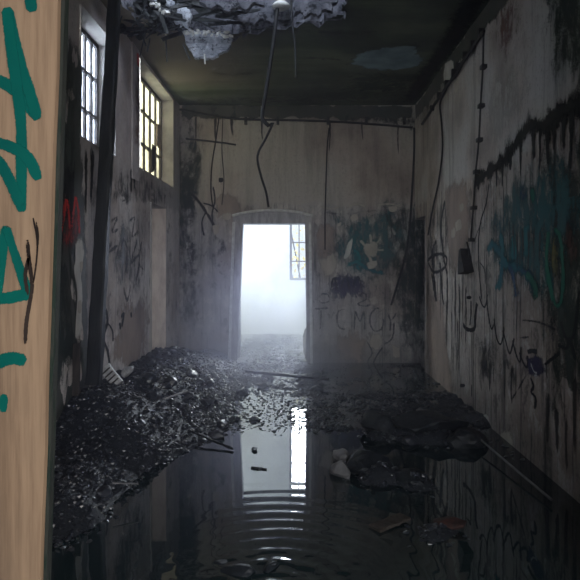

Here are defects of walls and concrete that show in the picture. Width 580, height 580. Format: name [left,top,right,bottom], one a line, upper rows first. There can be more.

spalling [121,0,347,42]
water stain [179,0,509,346]
water stain [383,199,467,373]
water stain [475,0,580,468]